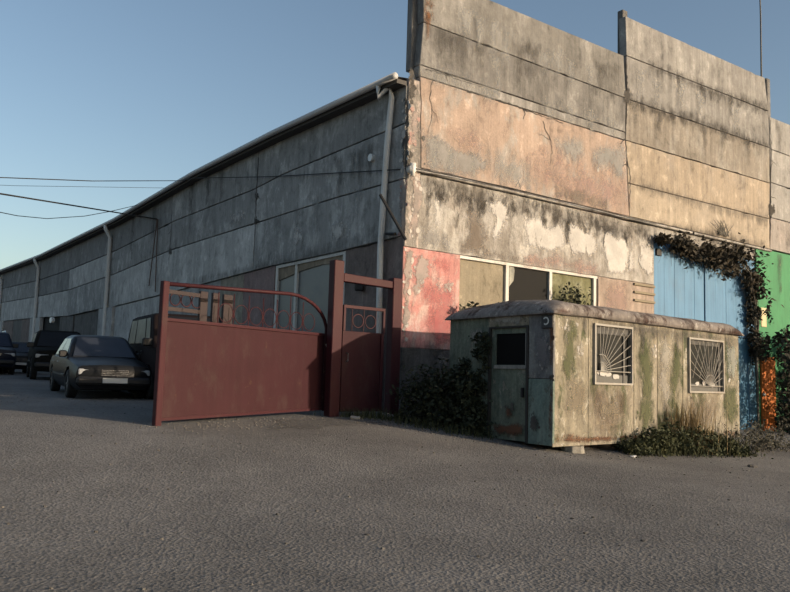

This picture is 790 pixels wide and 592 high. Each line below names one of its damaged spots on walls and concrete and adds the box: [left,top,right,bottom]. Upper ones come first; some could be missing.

crack [425,69,562,163]
crack [616,58,631,206]
leakage [420,178,648,248]
corrosion [494,392,646,444]